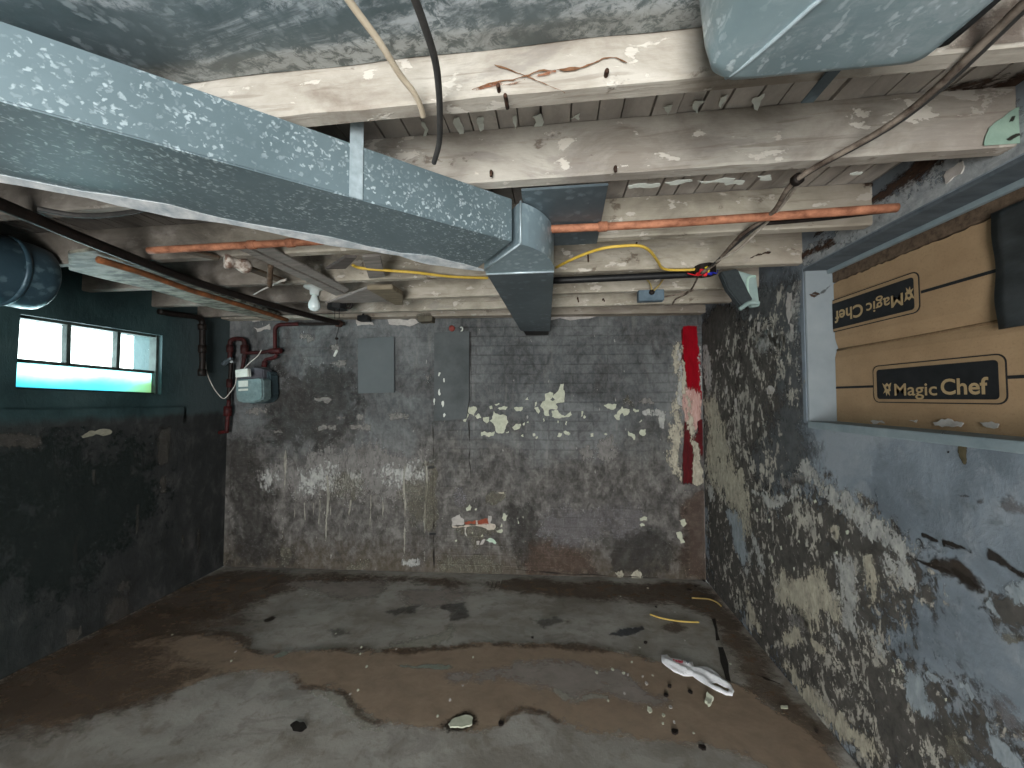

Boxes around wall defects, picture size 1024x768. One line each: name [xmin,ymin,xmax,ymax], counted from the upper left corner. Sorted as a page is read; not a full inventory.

peeling [752,93,765,111]
peeling [628,178,745,189]
peeling [745,281,803,392]
peeling [463,384,586,439]
peeling [604,396,654,440]
peeling [933,418,964,434]
spalling [452,504,519,549]
leakage [0,271,1024,768]